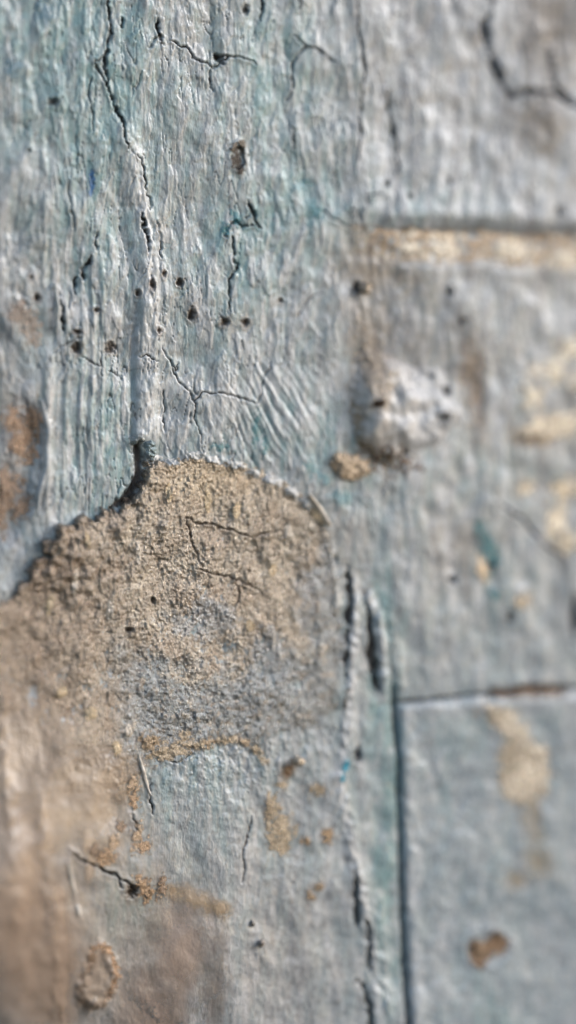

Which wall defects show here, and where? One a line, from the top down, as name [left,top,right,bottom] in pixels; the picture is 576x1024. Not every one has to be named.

crack [155,20,256,91]
crack [87,0,161,255]
crack [54,180,118,376]
crack [223,203,261,308]
crack [143,347,271,441]
peeling [0,396,45,541]
crack [186,517,279,604]
flaking render [0,450,344,803]
crack [68,850,131,888]